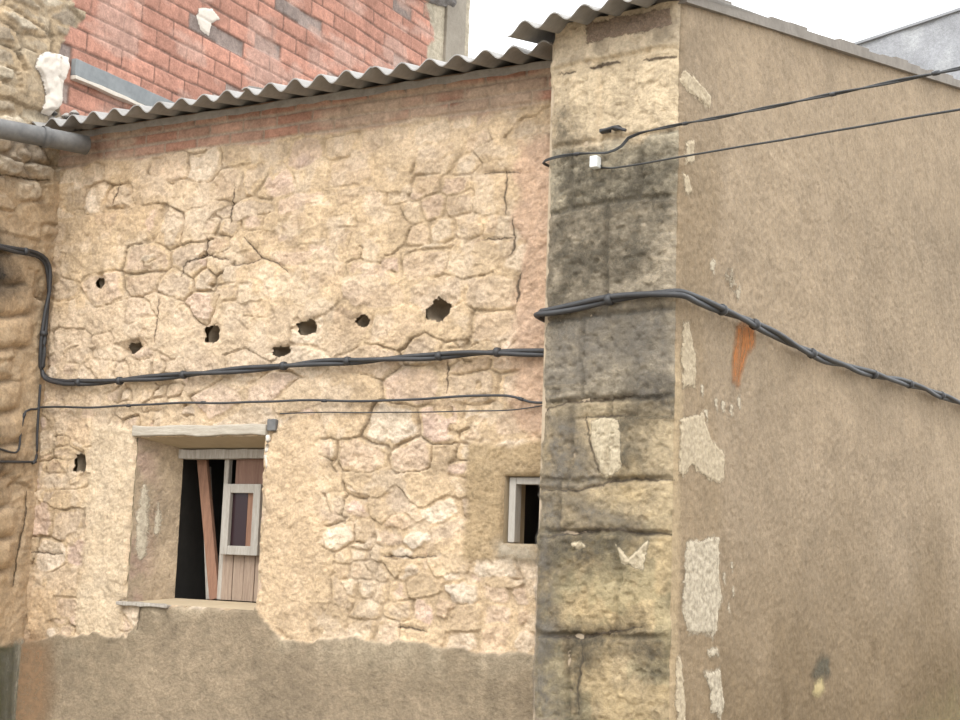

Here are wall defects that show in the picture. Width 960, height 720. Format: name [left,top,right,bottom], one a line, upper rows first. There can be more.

crack [183,189,288,273]
crack [486,171,521,301]
leakage [548,225,651,304]
leakage [546,310,670,417]
corrosion [733,325,754,384]
leakage [547,417,596,486]
spalling [591,417,622,479]
peeling [679,398,741,483]
spalling [615,537,650,570]
leakage [500,498,560,717]
peeling [682,537,734,657]
peeling [704,669,724,719]